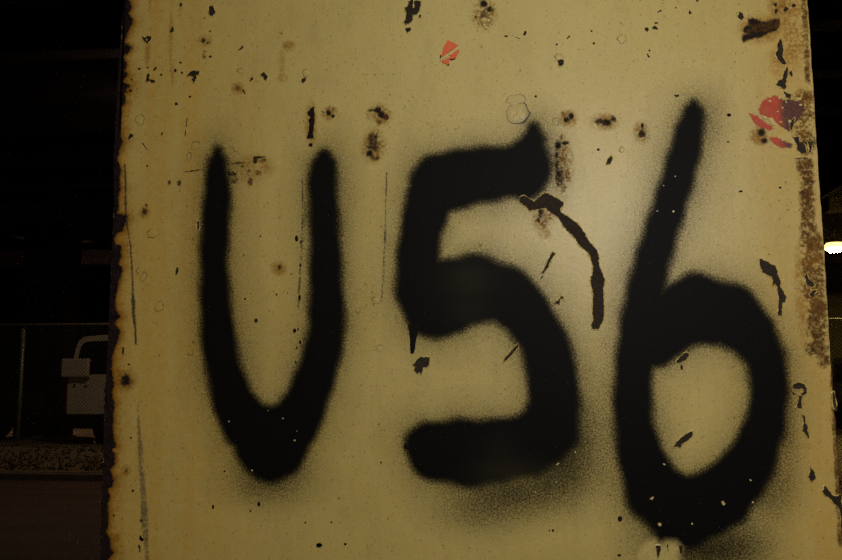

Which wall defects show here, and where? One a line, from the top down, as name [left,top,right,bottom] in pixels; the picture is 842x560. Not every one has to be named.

peeling [403,0,422,34]
corrosion [475,0,493,27]
corrosion [742,0,810,82]
corrosion [753,129,767,143]
peeling [749,38,813,159]
corrosion [795,92,831,366]
corrosion [100,0,136,560]
peeling [759,258,788,316]